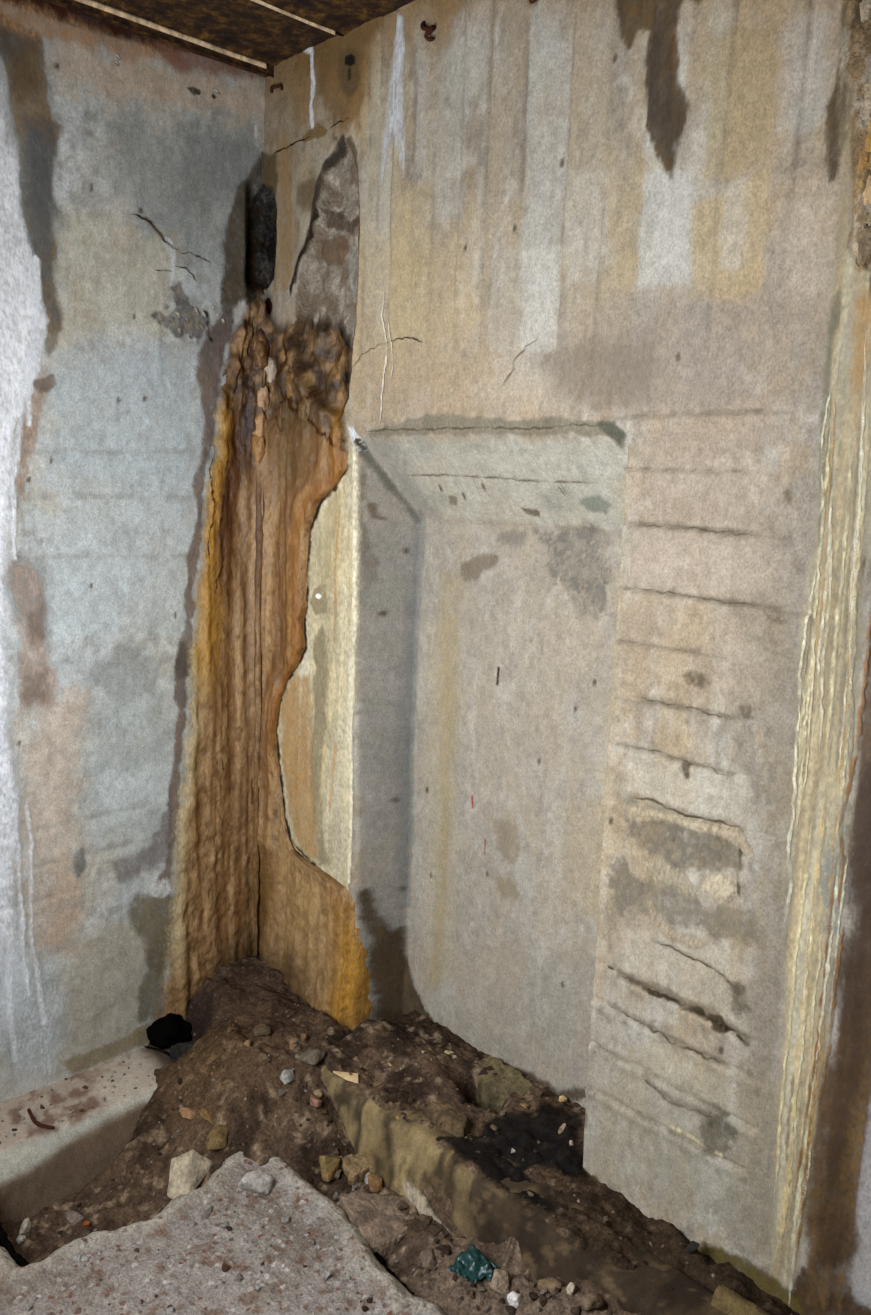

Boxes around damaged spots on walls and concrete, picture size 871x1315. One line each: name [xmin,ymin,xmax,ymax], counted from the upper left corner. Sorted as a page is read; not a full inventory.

leakage [617,0,697,172]
crack [133,214,209,285]
peeling [151,282,224,339]
spalling [245,153,277,314]
spalling [289,136,360,416]
leakage [0,14,263,1071]
leakage [277,299,625,1022]
leakage [697,14,871,1315]
crack [608,966,748,1061]
crack [660,944,731,985]